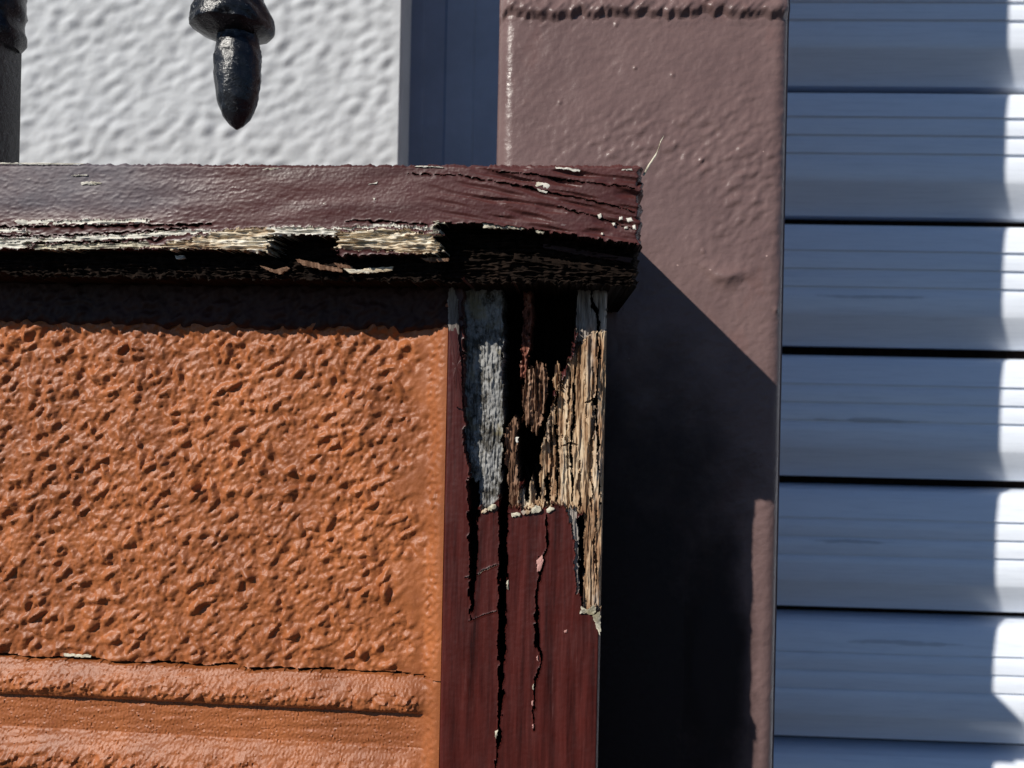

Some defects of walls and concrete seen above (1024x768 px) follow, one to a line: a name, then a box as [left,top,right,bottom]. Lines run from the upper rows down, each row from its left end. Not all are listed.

spalling [0,213,642,517]
crack [468,293,524,768]
peeling [580,605,601,635]